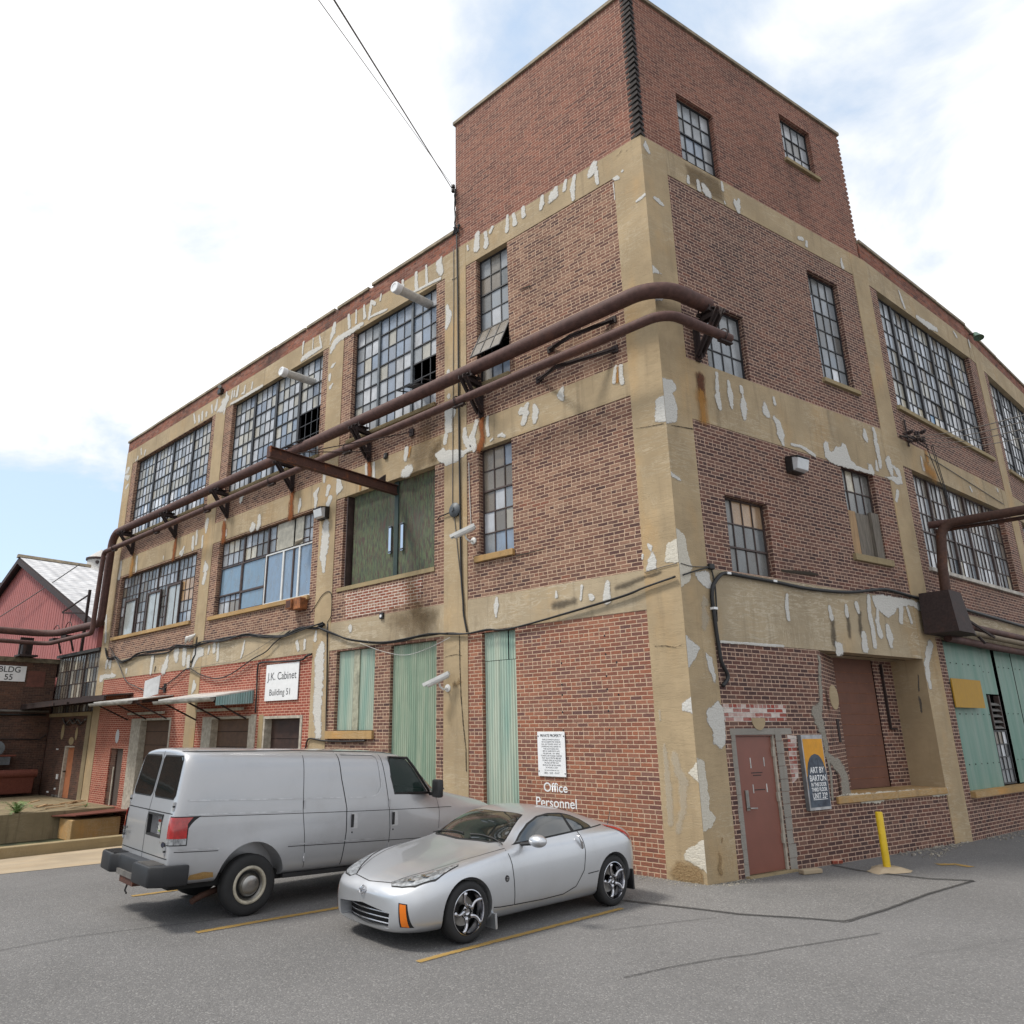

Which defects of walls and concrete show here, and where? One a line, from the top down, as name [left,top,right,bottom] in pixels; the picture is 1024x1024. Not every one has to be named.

peeling [539,161,599,210]
peeling [467,206,526,252]
peeling [402,256,443,292]
peeling [301,293,388,390]
peeling [435,393,506,466]
peeling [654,378,678,424]
rust [696,372,708,423]
peeling [762,397,903,502]
peeling [828,594,921,653]
peeling [295,630,325,739]
peeling [706,701,786,749]
peeling [671,759,723,883]